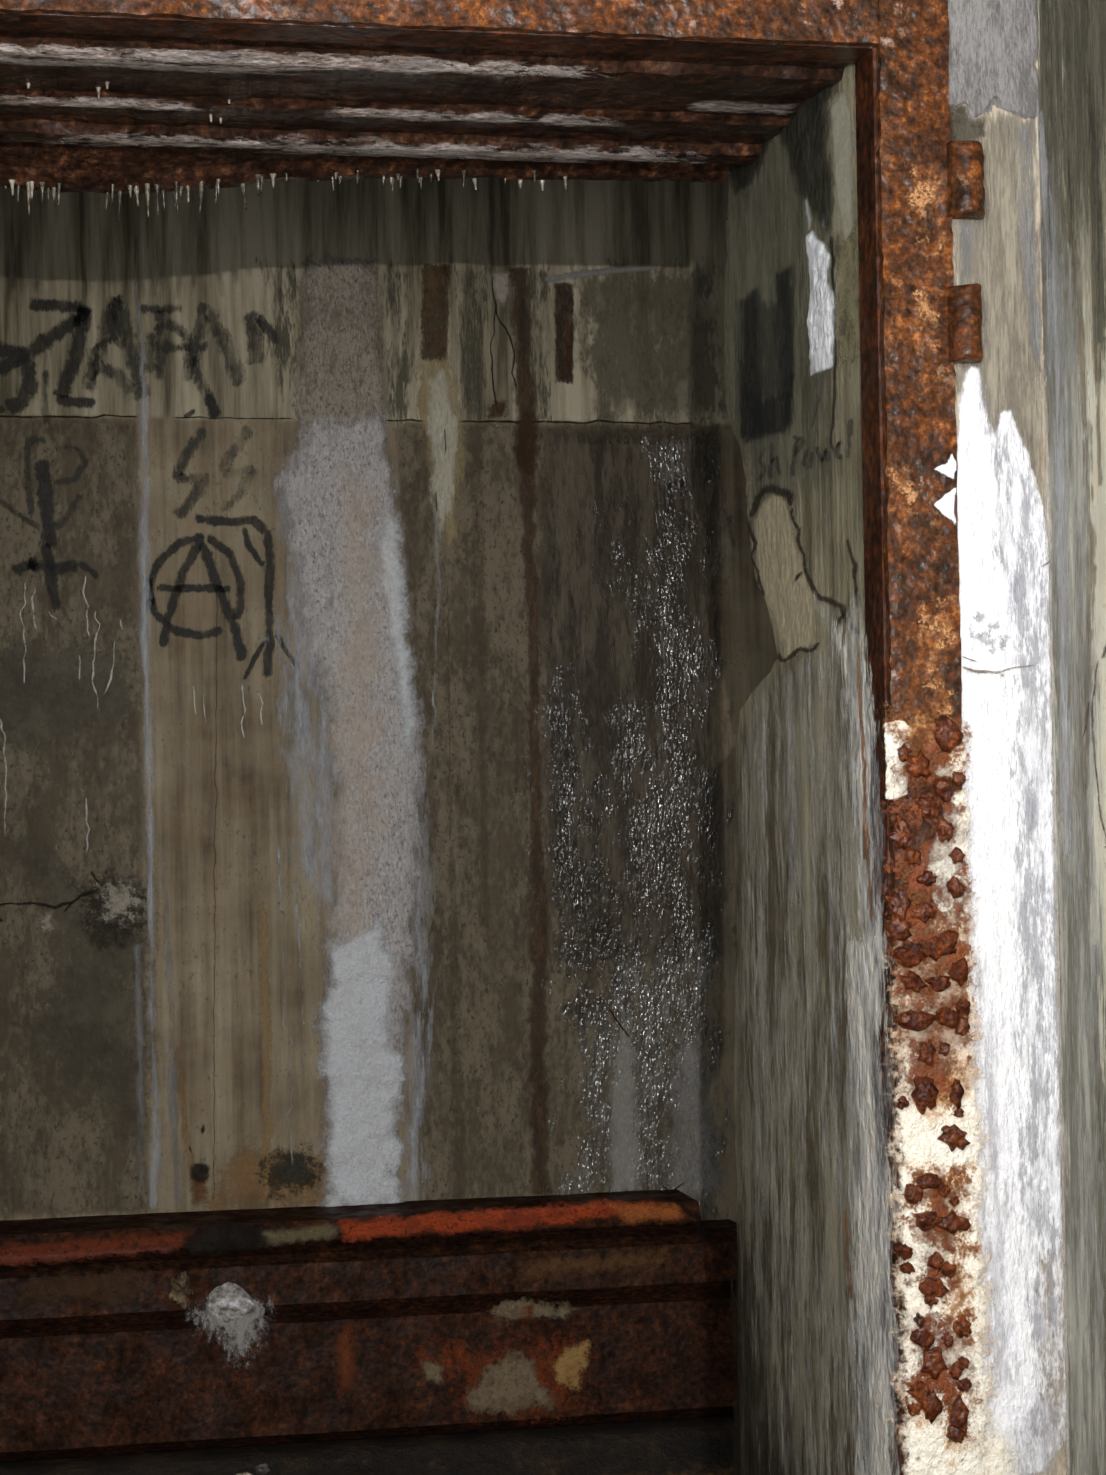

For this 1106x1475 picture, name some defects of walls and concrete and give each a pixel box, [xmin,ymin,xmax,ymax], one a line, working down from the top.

leakage [0,95,188,111]
leakage [0,44,524,76]
leakage [59,135,700,163]
corrosion [907,168,940,217]
corrosion [421,264,450,361]
corrosion [554,283,574,384]
leakage [210,256,734,1213]
leakage [731,0,1106,1475]
crack [1083,646,1106,847]
crack [0,872,147,922]
spalling [77,869,152,951]
corrosion [857,597,982,1465]